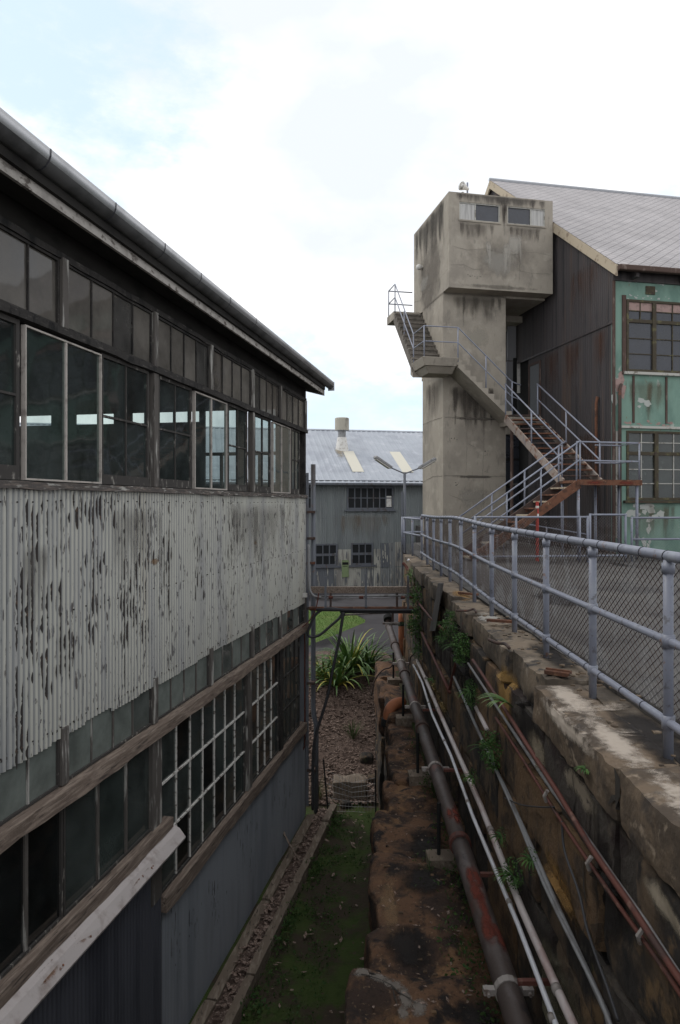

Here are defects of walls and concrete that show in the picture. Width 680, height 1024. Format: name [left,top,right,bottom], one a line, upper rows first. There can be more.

water stain [416,205,443,305]
water stain [460,194,544,221]
peeling [626,503,664,548]
peeling [15,494,172,769]